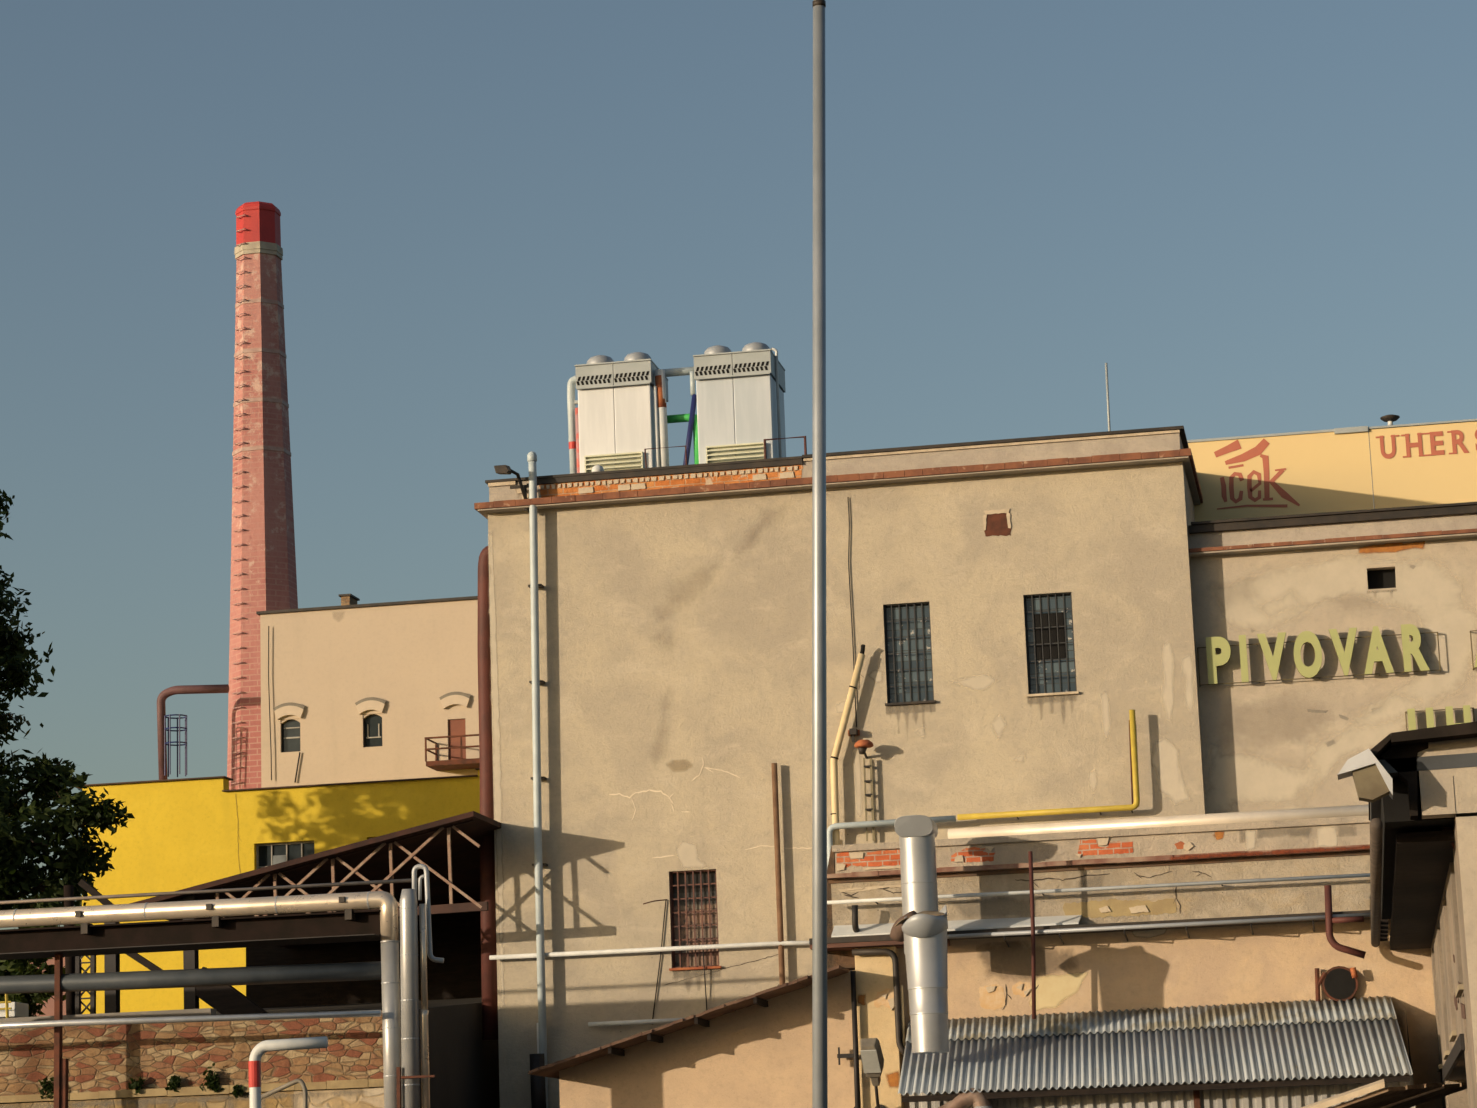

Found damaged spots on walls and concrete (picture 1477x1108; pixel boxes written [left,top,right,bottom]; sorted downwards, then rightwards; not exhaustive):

spalling [515,465,803,500]
efflorescence [1162,643,1193,719]
efflorescence [1152,739,1187,803]
spalling [836,849,901,893]
spalling [951,846,995,863]
spalling [1074,838,1133,857]